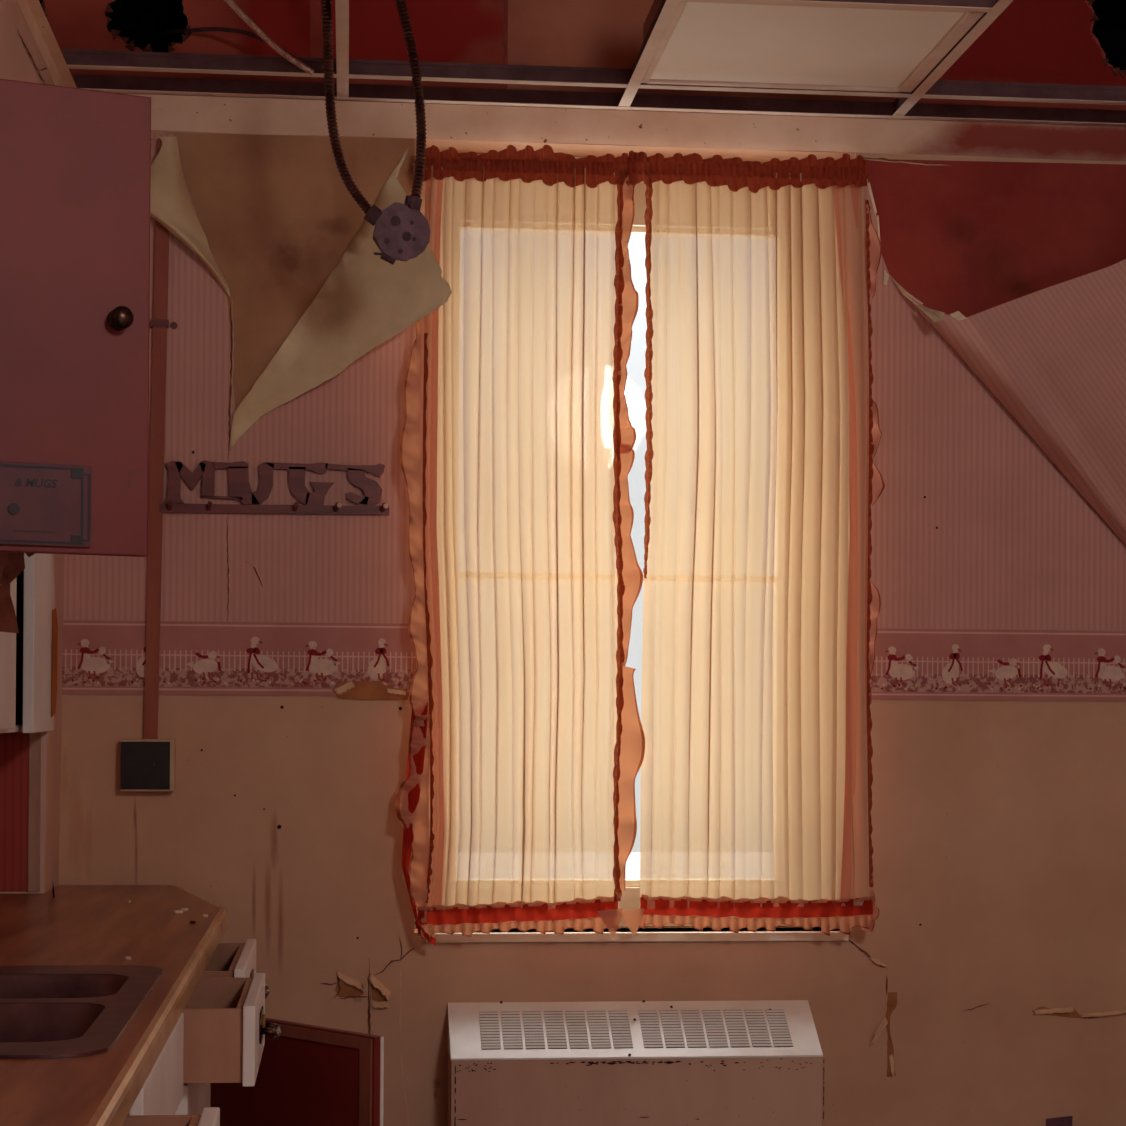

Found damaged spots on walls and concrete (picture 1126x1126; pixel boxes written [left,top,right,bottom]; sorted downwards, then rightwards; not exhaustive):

hole [105,0,192,52]
hole [1087,0,1126,78]
flaking render [165,132,414,411]
flaking render [863,159,1126,317]
crack [367,937,414,1035]